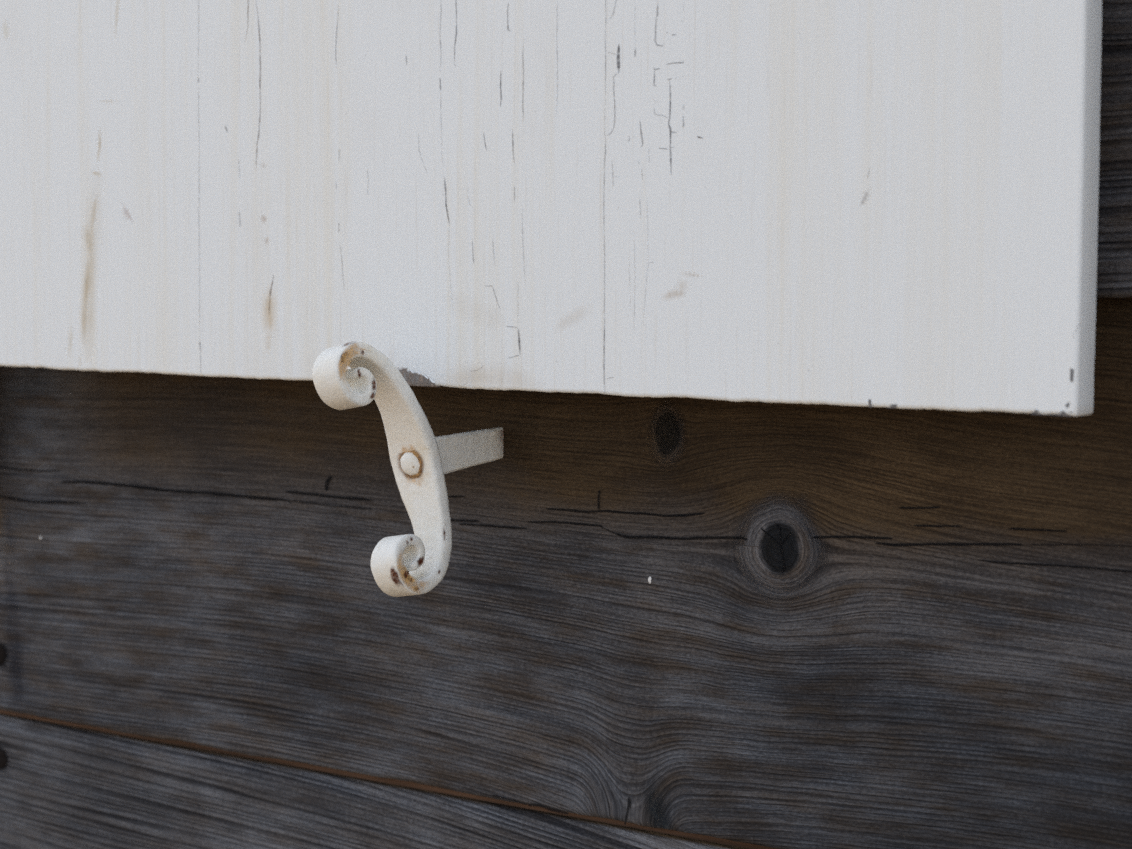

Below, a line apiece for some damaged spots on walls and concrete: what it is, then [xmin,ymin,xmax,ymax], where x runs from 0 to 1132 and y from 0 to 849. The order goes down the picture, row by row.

peeling [399,368,439,387]
crack [448,491,1132,573]